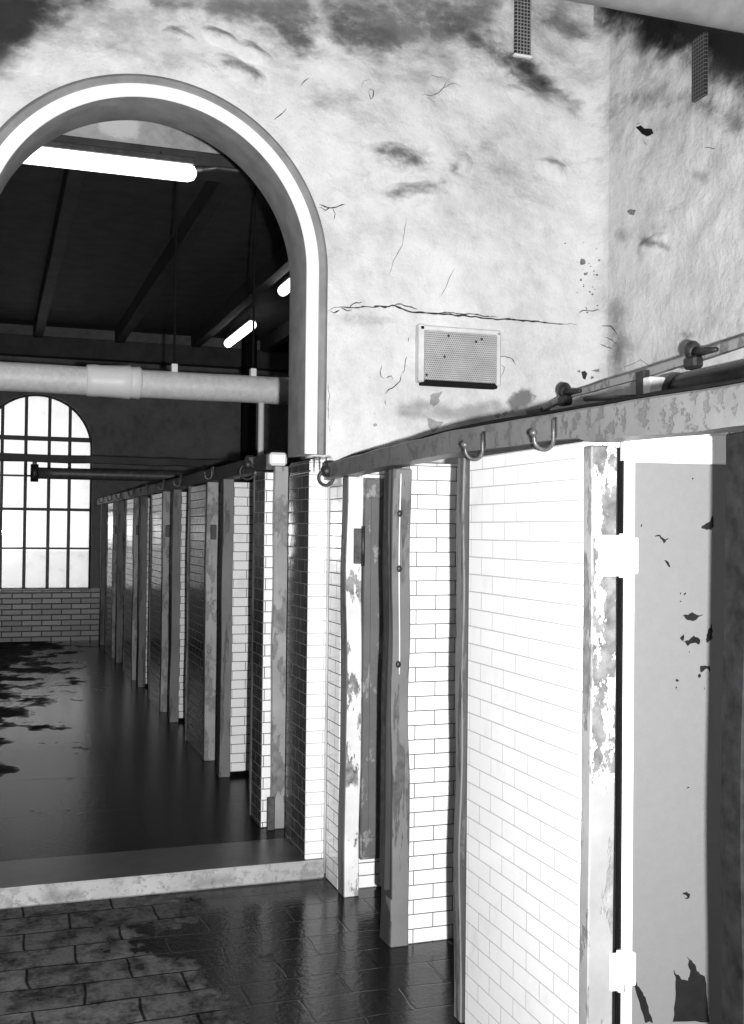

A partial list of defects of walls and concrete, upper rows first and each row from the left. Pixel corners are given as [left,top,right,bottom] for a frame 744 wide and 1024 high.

leakage [645,23,681,54]
crack [330,270,650,368]
peeling [680,612,713,653]
peeling [635,982,653,1023]
peeling [673,957,710,1023]